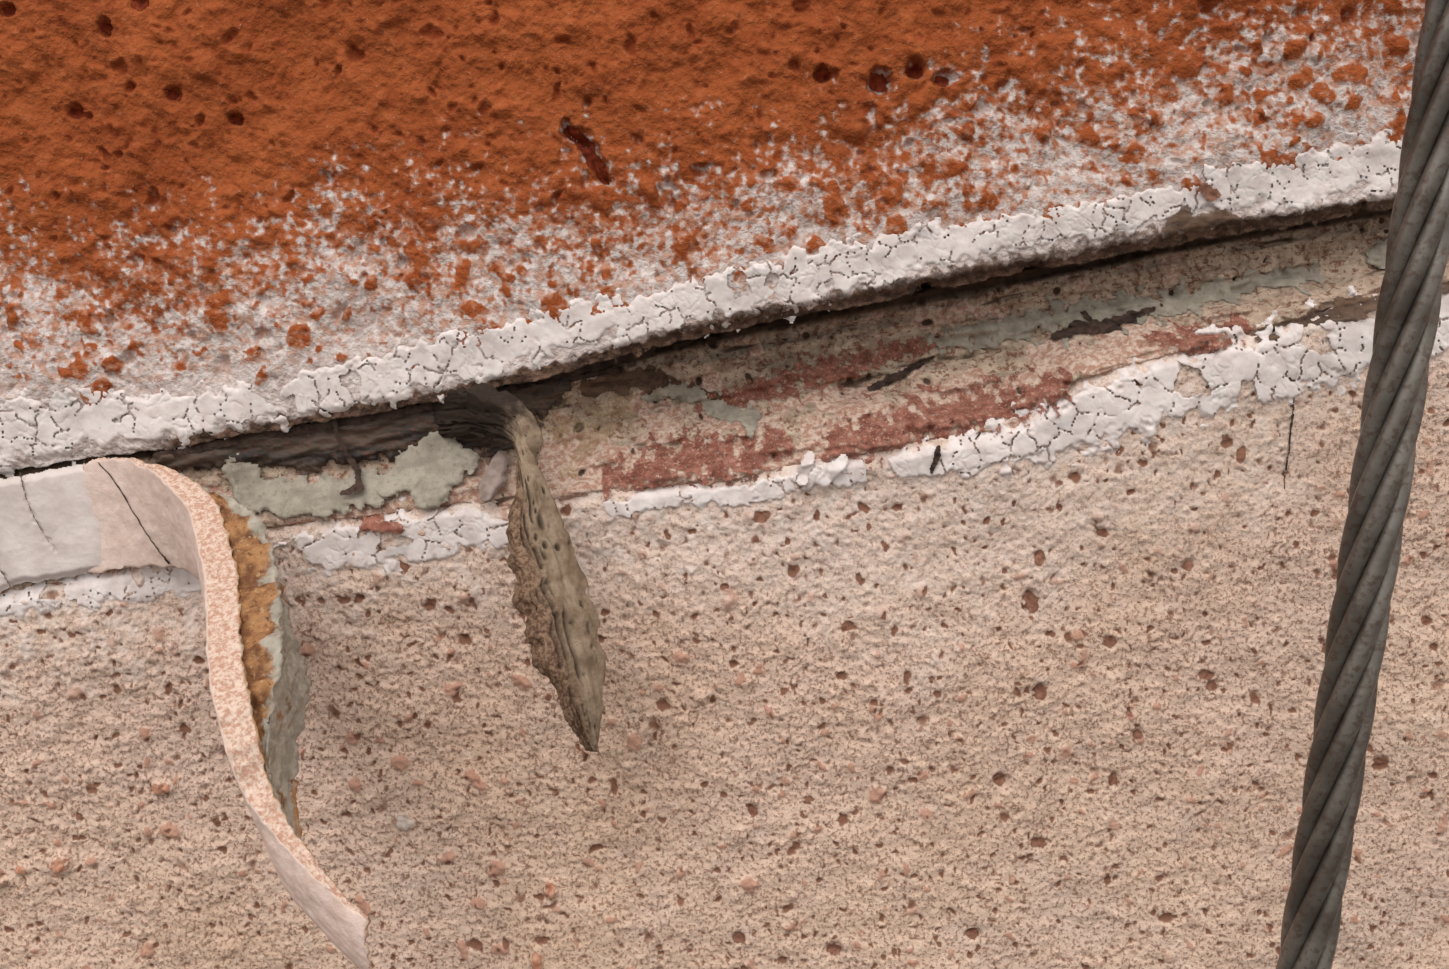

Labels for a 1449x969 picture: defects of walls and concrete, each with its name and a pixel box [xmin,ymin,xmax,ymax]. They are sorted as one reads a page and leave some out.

peeling [359,514,405,535]
peeling [433,382,607,752]
crack [0,129,1402,621]
crack [1430,293,1449,359]